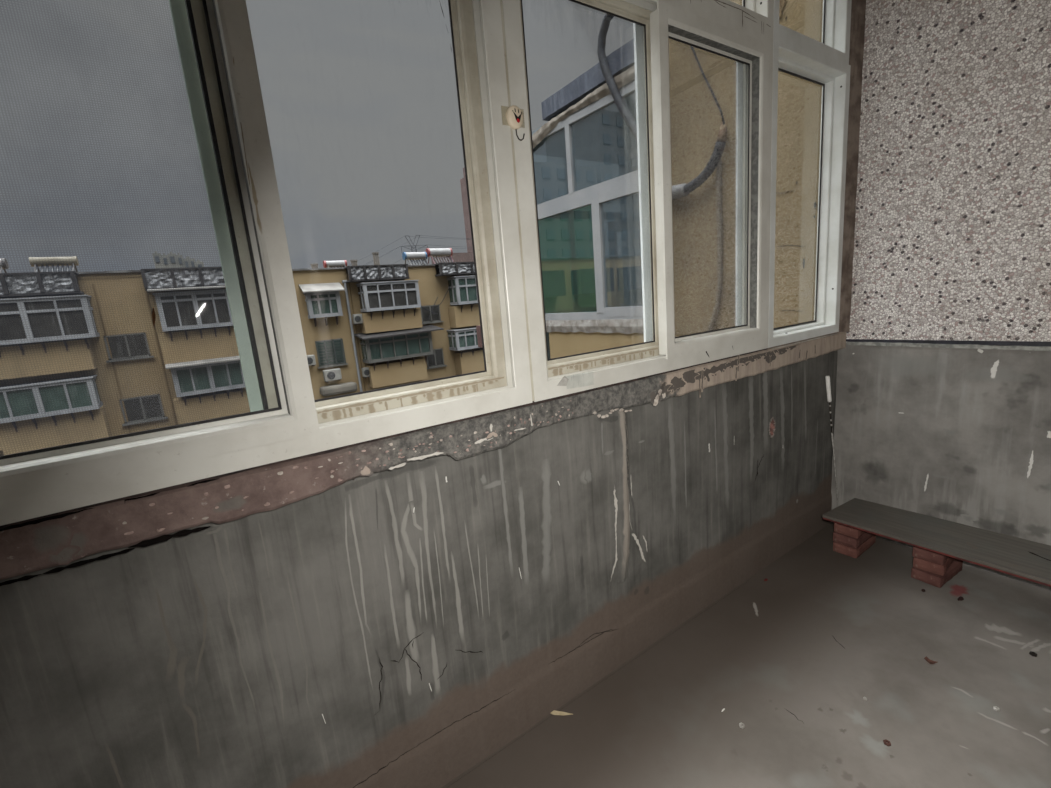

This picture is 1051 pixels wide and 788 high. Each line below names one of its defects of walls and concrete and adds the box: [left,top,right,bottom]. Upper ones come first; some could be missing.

peeling [29,522,92,565]
crack [0,526,211,586]
water stain [344,494,386,714]
water stain [375,466,467,704]
water stain [464,463,491,625]
water stain [497,448,553,596]
spalling [593,408,632,424]
water stain [667,398,688,531]
peeling [650,342,816,406]
water stain [747,361,818,487]
crack [376,632,482,714]
crack [353,691,512,788]